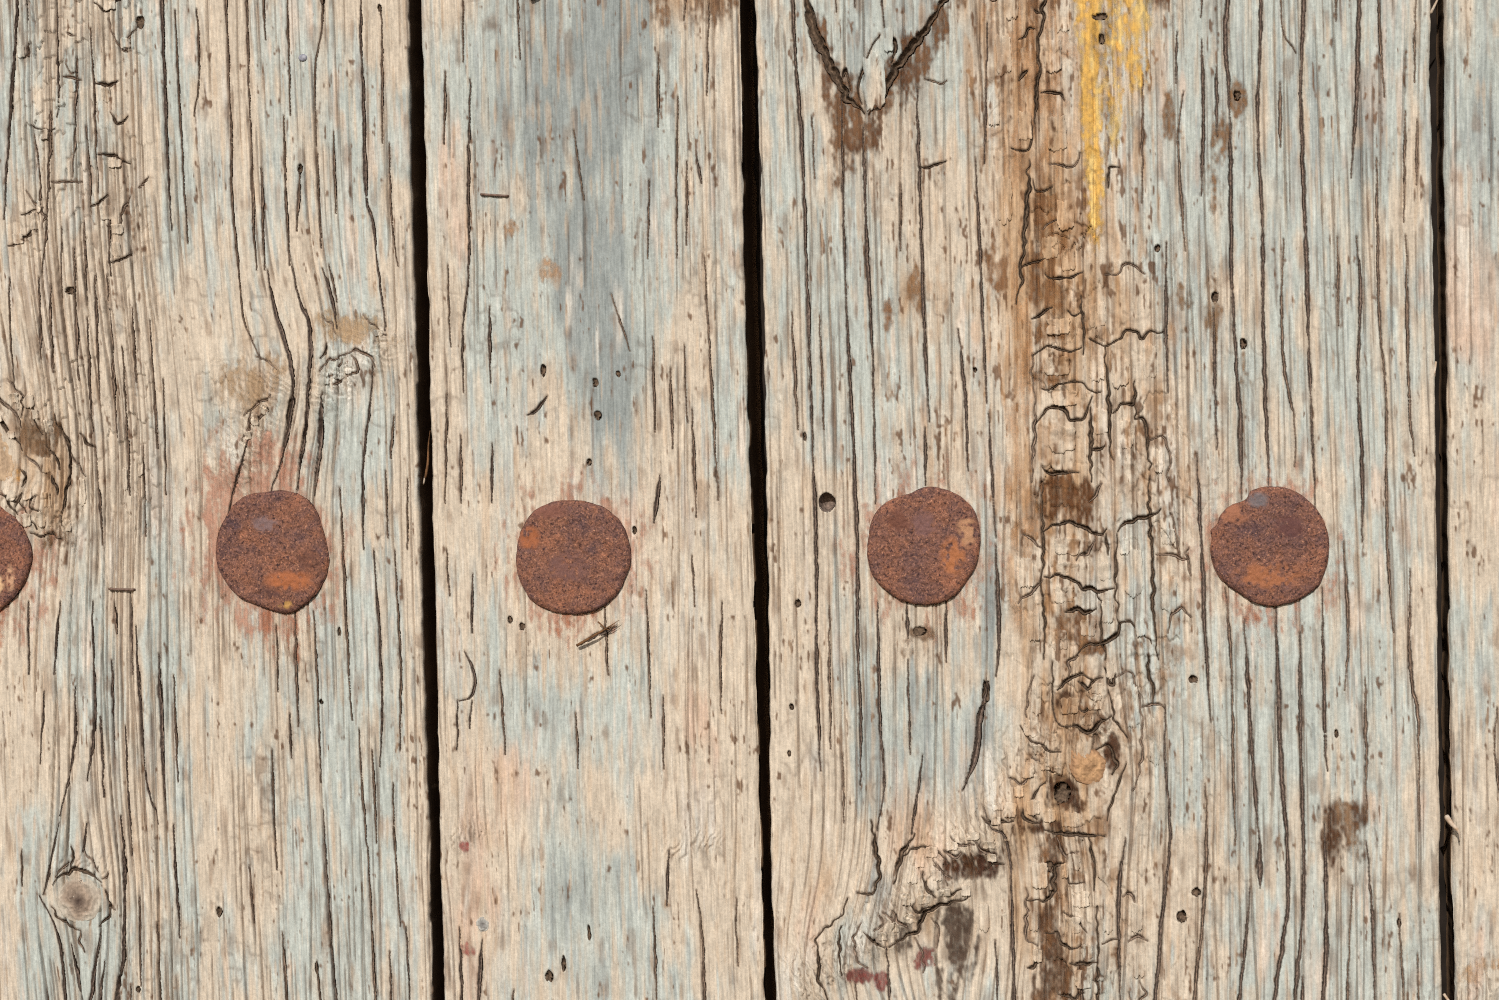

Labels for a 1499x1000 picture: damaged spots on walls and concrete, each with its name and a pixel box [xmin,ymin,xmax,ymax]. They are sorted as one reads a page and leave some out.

crack [443,0,493,503]
rust [1,540,58,642]
crack [0,0,410,1000]
rust [180,431,310,637]
crack [446,549,505,755]
rust [530,600,598,635]
crack [791,0,1420,1000]
crack [459,928,514,1000]